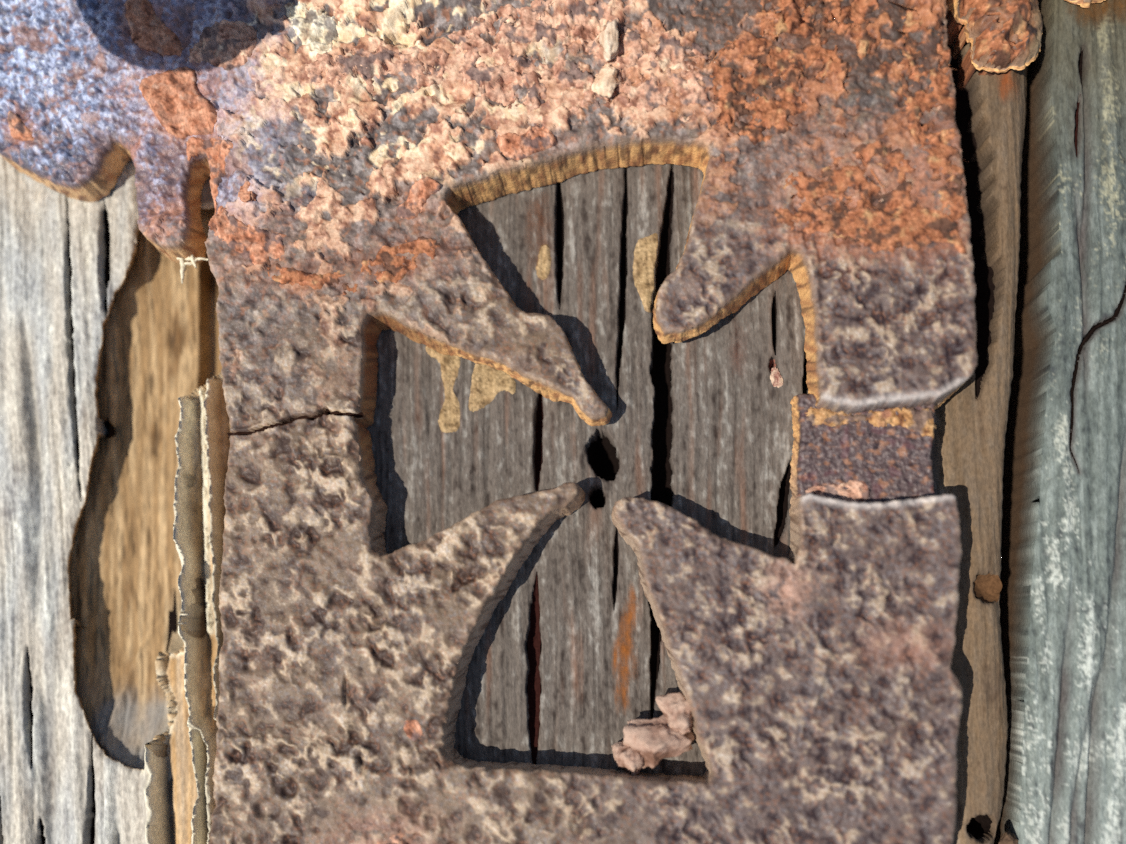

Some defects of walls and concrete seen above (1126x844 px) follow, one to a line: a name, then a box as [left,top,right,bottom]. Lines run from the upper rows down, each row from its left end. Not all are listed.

rust [7,111,34,141]
rust [305,0,1032,254]
rust [124,0,440,295]
crack [1069,285,1126,472]
crack [227,409,364,438]
rust [805,407,936,439]
rust [805,480,870,502]
rust [403,720,422,741]